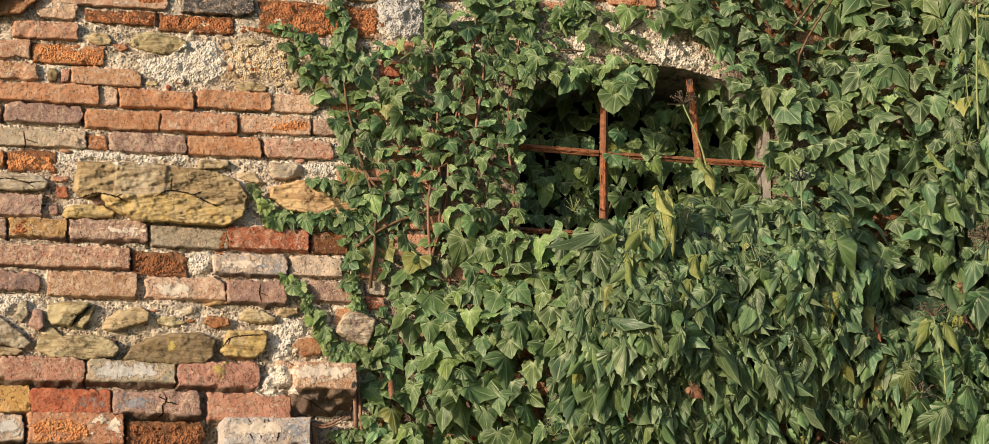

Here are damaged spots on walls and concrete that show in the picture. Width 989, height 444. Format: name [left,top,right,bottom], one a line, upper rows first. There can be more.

corrosion [689,87,752,166]
crack [76,192,125,201]
crack [154,178,218,207]
corrosion [520,144,607,211]